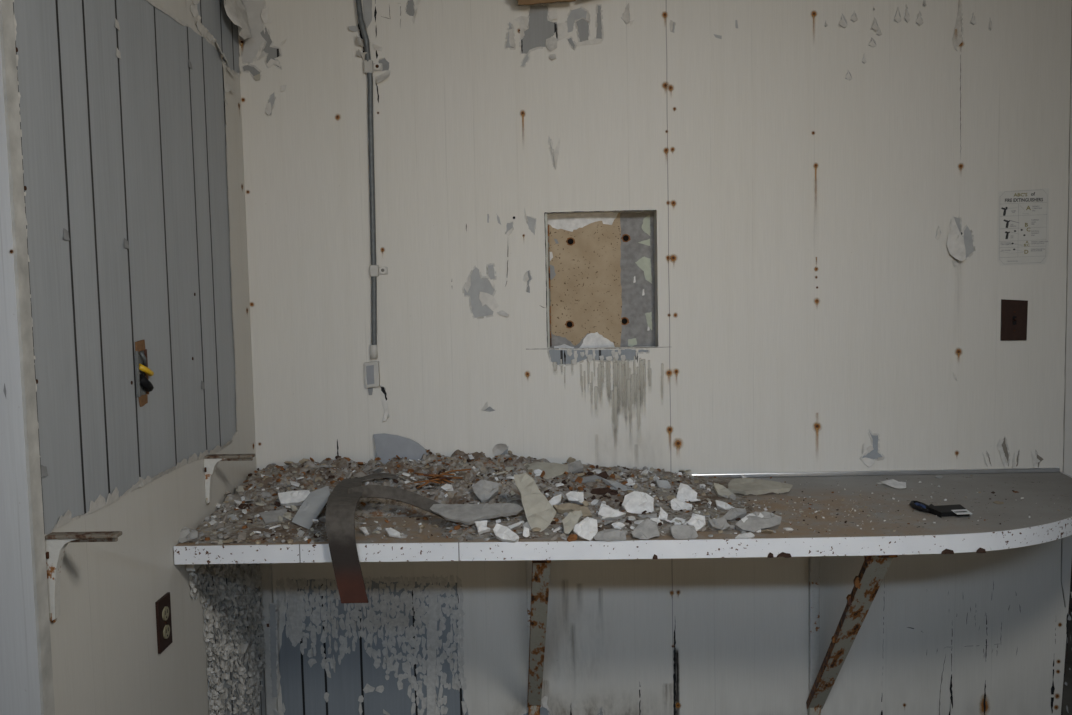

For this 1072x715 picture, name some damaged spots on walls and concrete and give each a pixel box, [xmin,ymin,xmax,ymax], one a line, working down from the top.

peeling [190,0,287,81]
peeling [504,4,604,68]
peeling [462,263,509,319]
damp [553,356,663,426]
peeling [189,563,468,715]
spalling [1061,563,1072,715]